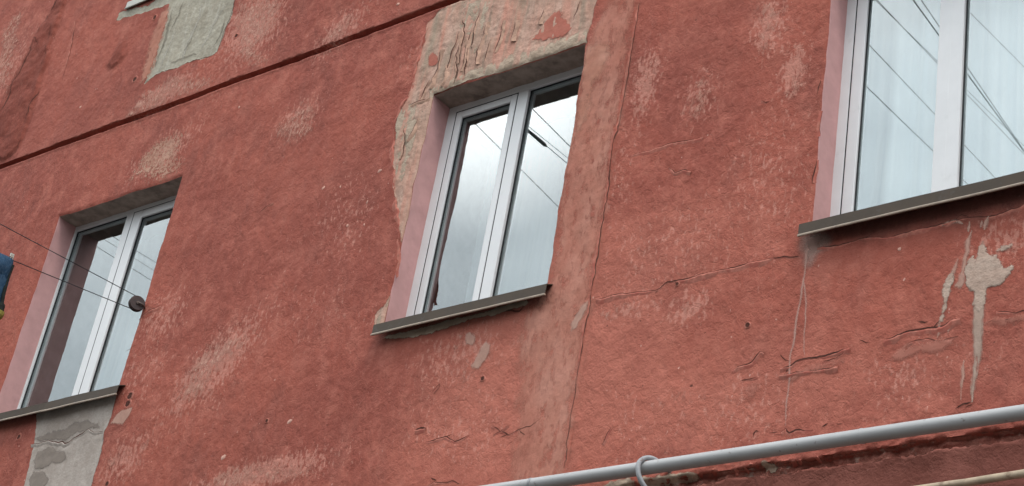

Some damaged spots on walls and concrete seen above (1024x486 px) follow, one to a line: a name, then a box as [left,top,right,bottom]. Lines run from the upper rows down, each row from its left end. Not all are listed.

crack [3,0,75,118]
spalling [117,0,235,116]
peeling [378,0,633,481]
crack [563,1,1024,467]
peeling [374,296,390,324]
spalling [24,395,132,486]